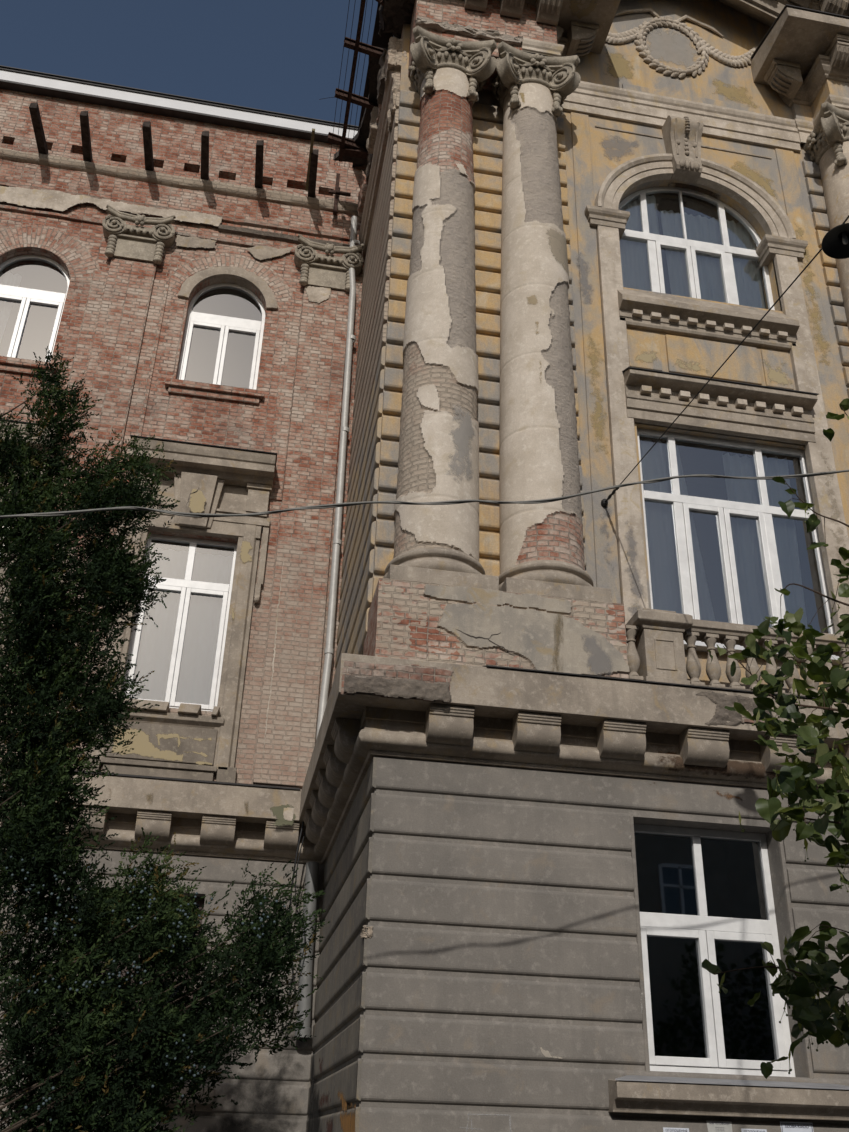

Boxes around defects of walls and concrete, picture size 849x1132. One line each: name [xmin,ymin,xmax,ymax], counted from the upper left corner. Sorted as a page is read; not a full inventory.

peeling [0,186,222,248]
peeling [409,89,478,356]
peeling [393,341,479,559]
peeling [516,281,585,571]
peeling [341,578,629,703]
crack [459,630,518,656]
peeling [112,726,212,765]
rust [338,1092,356,1132]